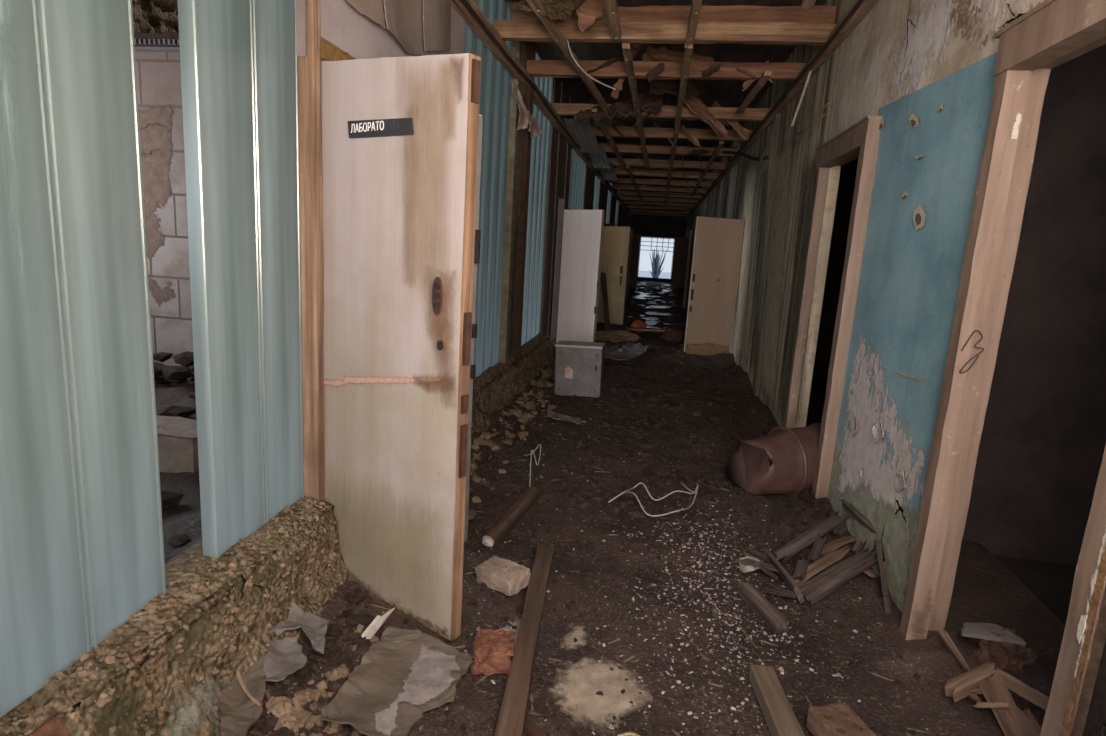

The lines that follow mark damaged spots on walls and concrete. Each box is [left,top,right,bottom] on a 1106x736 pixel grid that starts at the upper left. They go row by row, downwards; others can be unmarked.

crack [139,122,168,157]
peeling [138,105,173,258]
peeling [148,275,176,306]
peeling [832,334,925,512]